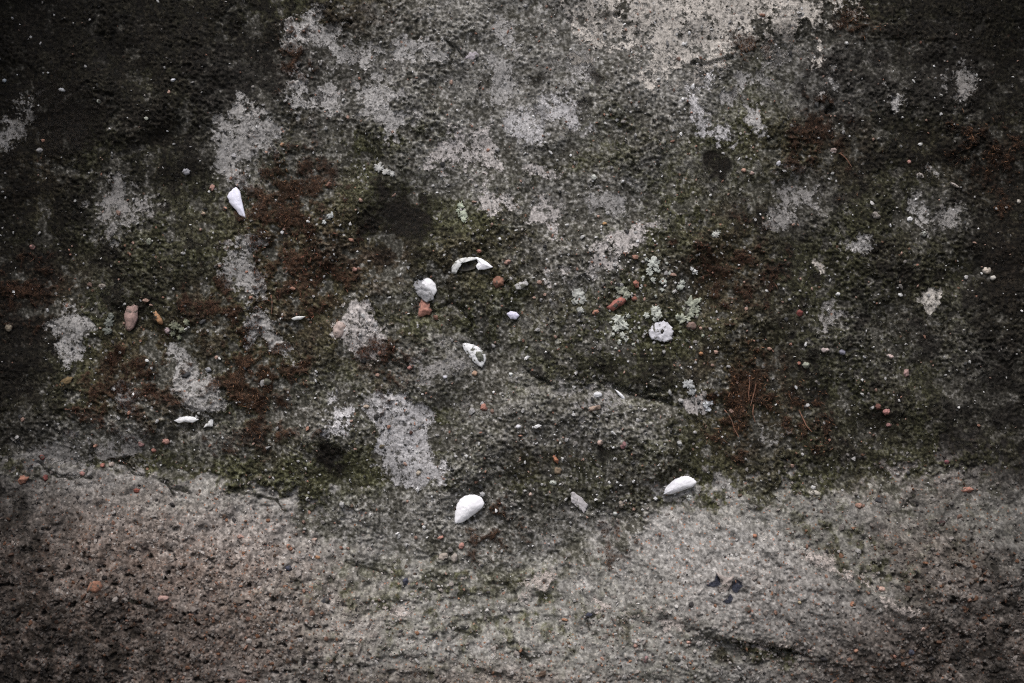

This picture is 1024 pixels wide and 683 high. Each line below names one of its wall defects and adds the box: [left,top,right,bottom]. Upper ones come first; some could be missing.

water stain [355,174,453,264]
water stain [310,432,345,478]